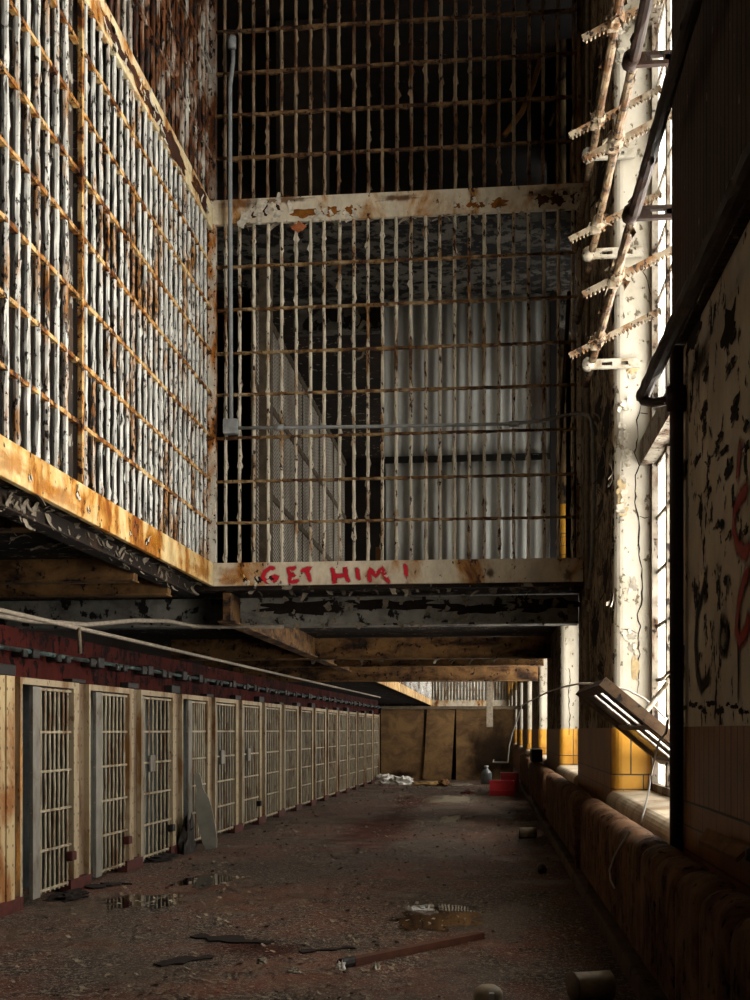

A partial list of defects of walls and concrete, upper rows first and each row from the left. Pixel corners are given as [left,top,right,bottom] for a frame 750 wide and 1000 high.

peeling [398,197,509,225]
peeling [686,315,709,384]
peeling [720,297,736,381]
peeling [684,391,750,526]
peeling [0,475,202,595]
peeling [713,519,749,541]
peeling [241,558,614,682]
spalling [622,628,640,681]